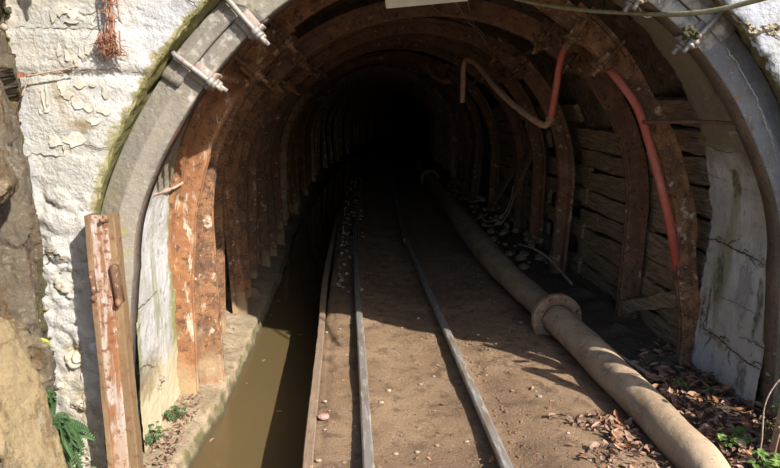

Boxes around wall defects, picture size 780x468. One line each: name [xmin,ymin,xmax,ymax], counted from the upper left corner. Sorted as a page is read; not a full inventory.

peeling [49,3,79,24]
crack [12,5,119,31]
peeling [56,41,93,67]
crack [22,55,149,91]
peeling [57,78,112,125]
peeling [49,132,86,156]
crack [706,236,766,268]
crack [701,313,776,379]